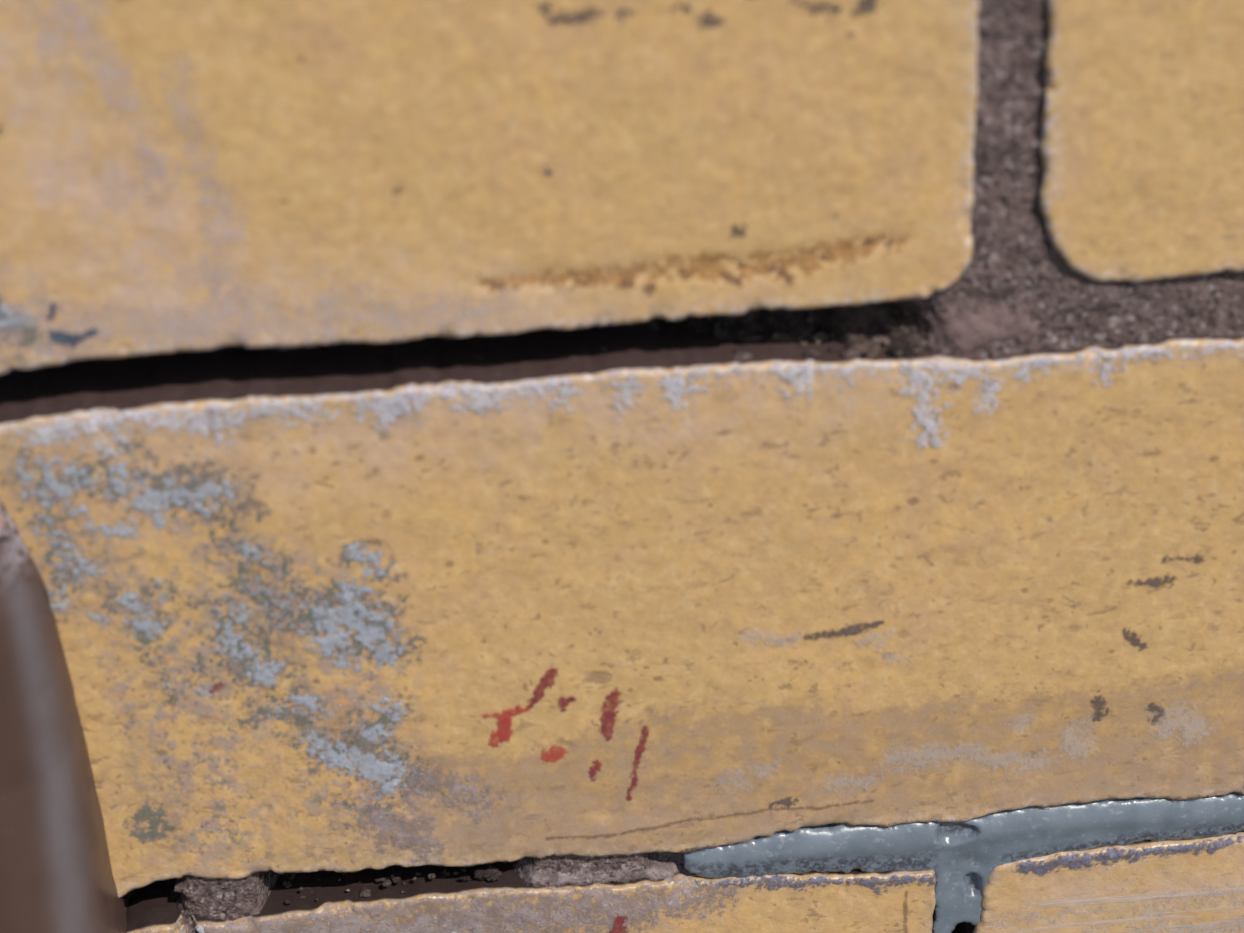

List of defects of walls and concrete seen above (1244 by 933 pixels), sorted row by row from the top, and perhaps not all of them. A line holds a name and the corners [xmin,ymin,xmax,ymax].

peeling [0,297,99,351]
peeling [1,429,431,822]